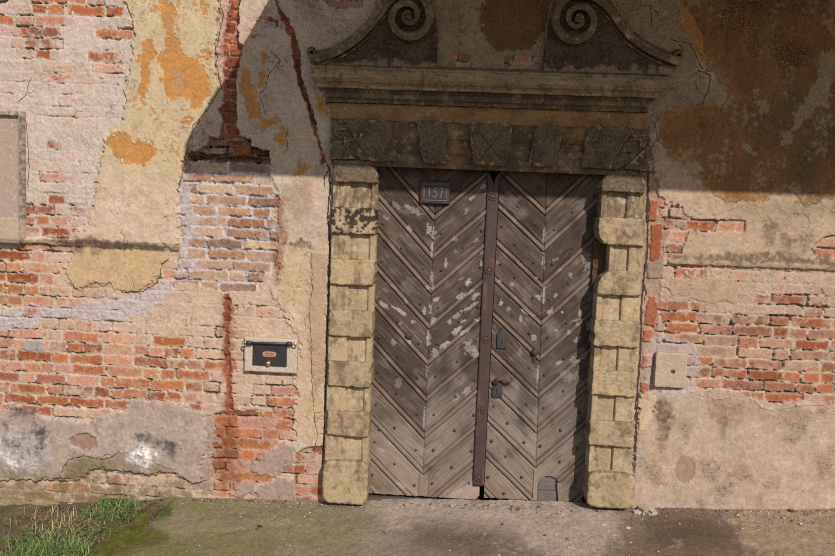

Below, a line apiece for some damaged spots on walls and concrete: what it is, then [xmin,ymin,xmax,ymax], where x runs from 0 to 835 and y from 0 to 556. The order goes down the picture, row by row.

flaking render [11,2,113,81]
flaking render [92,48,123,79]
peeling [136,0,213,128]
peeling [239,50,291,147]
peeling [103,130,157,168]
spalling [188,138,271,166]
flaking render [26,187,88,237]
flaking render [649,201,746,262]
flaking render [643,297,835,408]
flaking render [0,322,325,501]
leakage [0,424,50,470]
leakage [125,434,173,470]